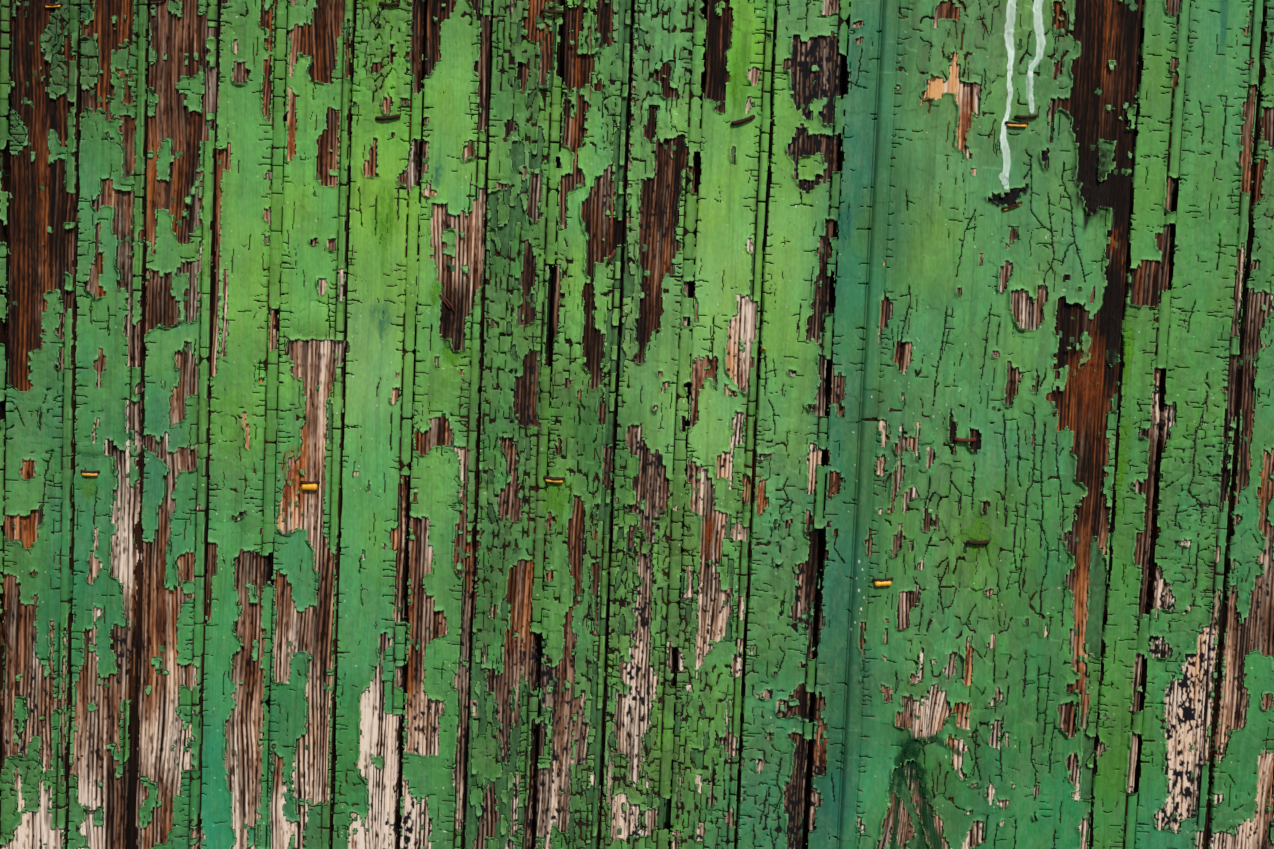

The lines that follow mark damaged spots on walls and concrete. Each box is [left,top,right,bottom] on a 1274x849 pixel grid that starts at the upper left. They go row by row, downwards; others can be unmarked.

peeling [371,0,702,522]
peeling [348,412,843,849]
crack [702,318,721,353]
peeling [681,294,760,427]
crack [934,306,953,394]
peeling [882,633,1016,826]
crack [979,308,1000,376]
crack [923,407,1069,627]
crack [974,650,1059,849]
crack [1023,156,1090,286]
peeling [989,0,1173,849]
peeling [1155,244,1274,849]